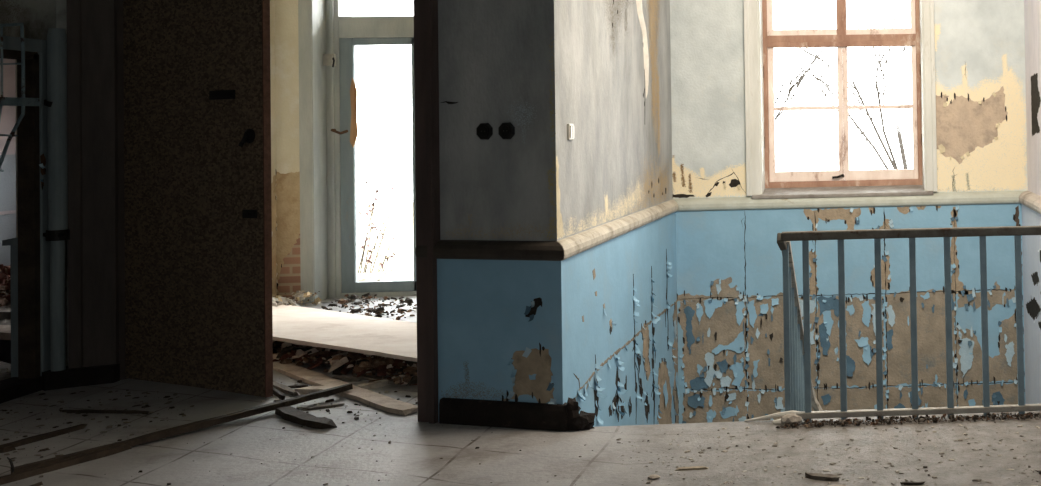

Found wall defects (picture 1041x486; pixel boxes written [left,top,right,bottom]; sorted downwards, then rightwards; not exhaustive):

flaking render [271,171,301,297]
flaking render [556,156,564,239]
peeling [648,156,747,198]
peeling [524,297,542,321]
peeling [608,205,1041,425]
peeling [502,343,557,405]